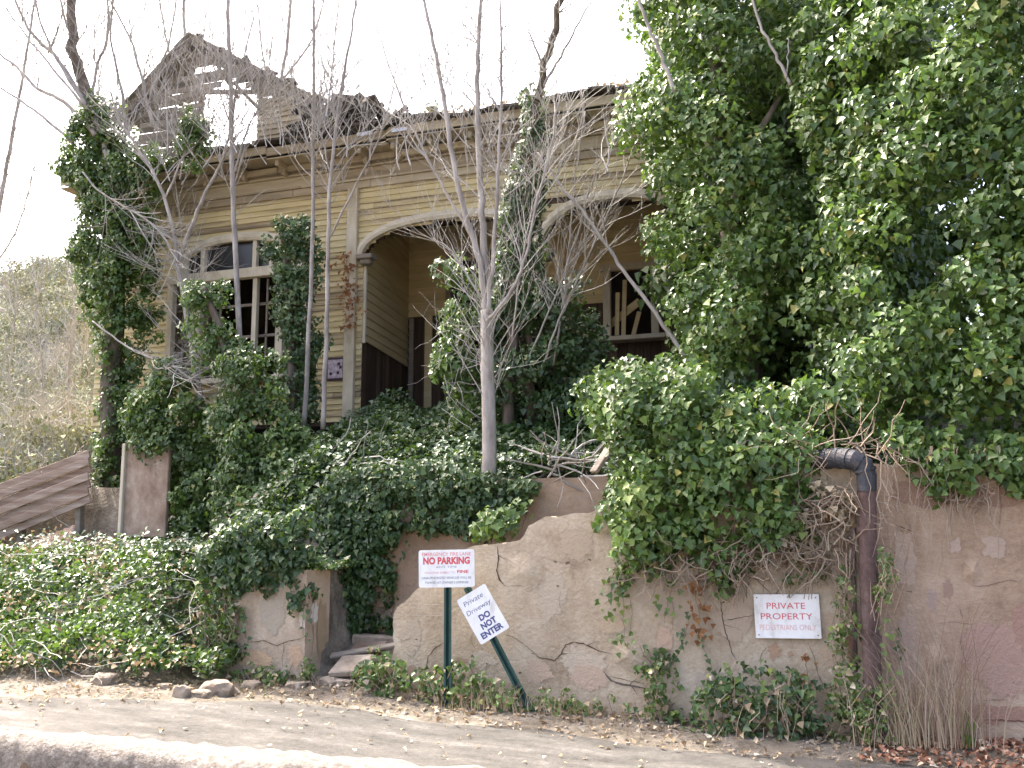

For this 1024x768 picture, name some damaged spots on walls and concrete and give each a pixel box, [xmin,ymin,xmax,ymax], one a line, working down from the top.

crack [251,599,315,665]
crack [504,634,648,695]